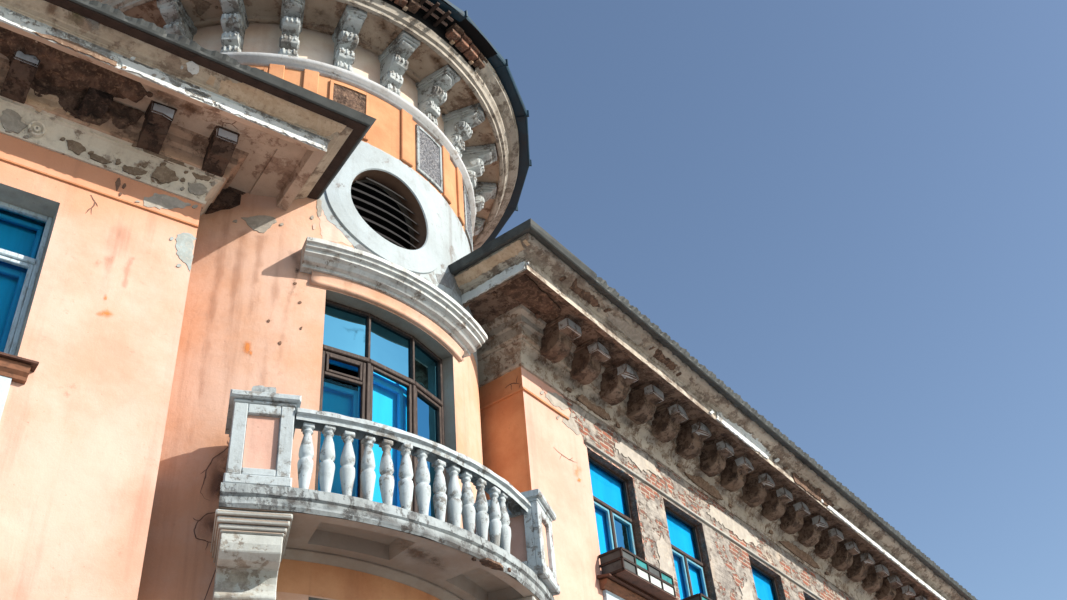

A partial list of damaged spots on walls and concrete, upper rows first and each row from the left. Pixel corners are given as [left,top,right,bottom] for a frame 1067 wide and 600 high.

spalling [0,12,219,210]
peeling [232,215,284,233]
peeling [169,232,196,271]
spalling [559,276,611,313]
spalling [649,346,682,376]
crack [193,441,229,548]
flaking render [540,387,854,600]